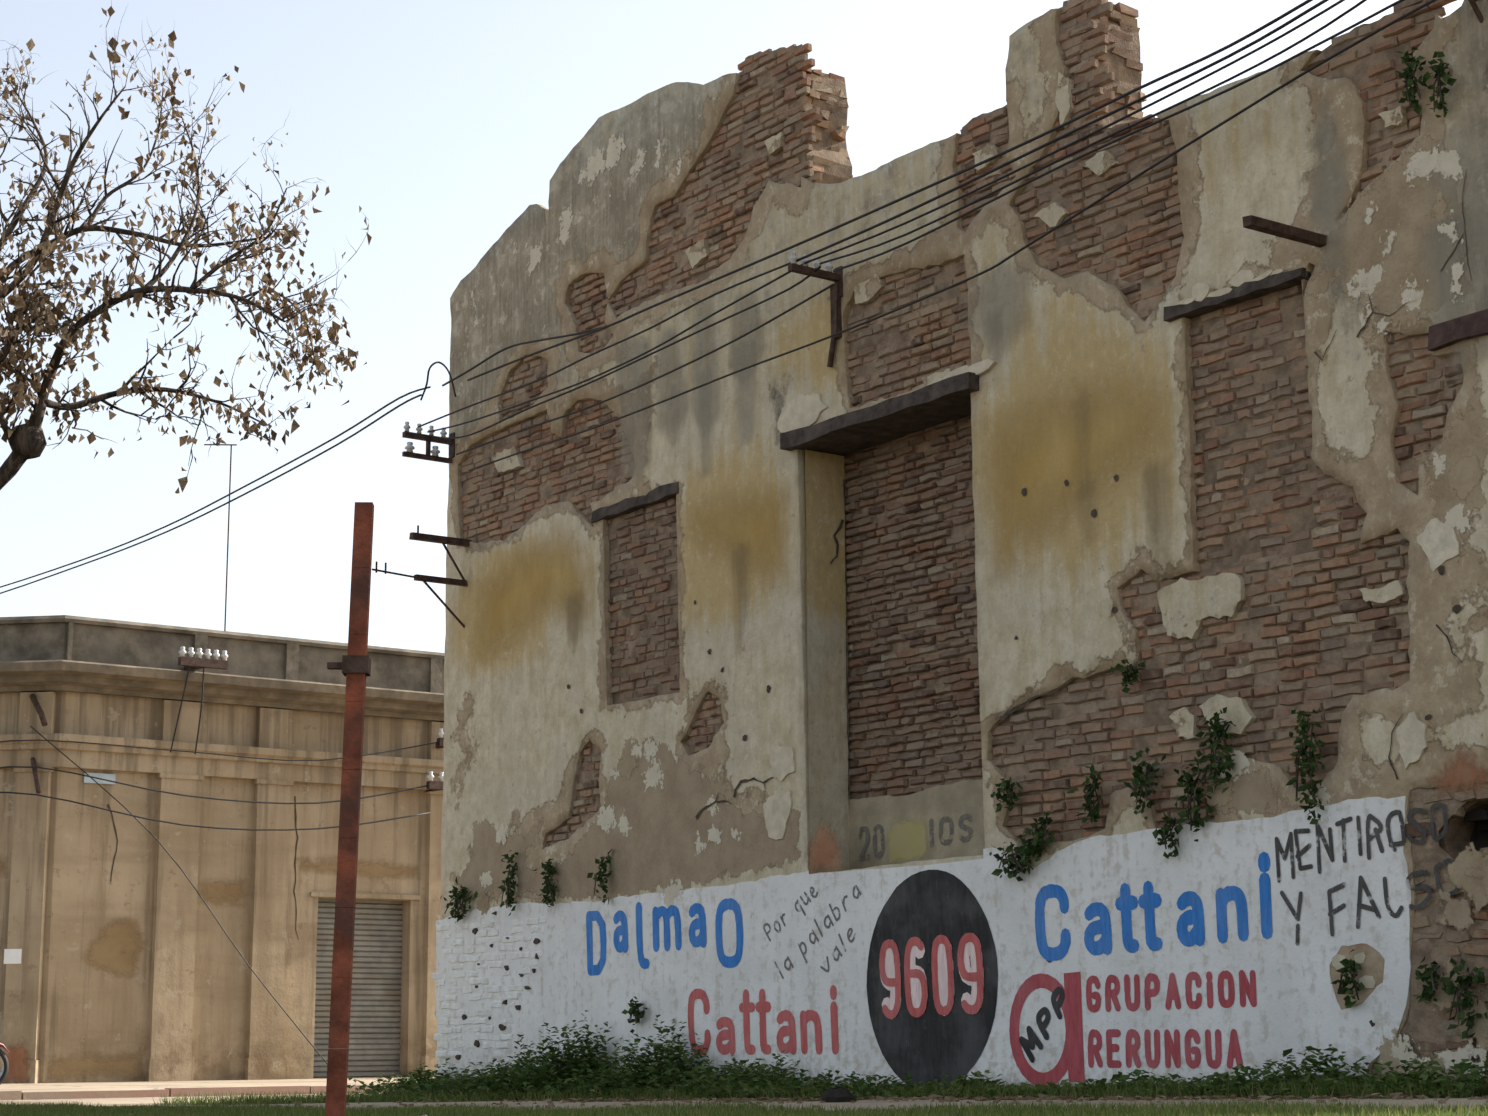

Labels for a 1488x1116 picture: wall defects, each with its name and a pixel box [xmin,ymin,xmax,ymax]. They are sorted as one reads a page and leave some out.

flaking render [512,43,853,354]
flaking render [956,0,1184,321]
flaking render [1306,0,1488,534]
flaking render [460,356,636,543]
crack [998,681,1070,724]
water stain [1001,400,1146,552]
flaking render [992,359,1410,844]
flaking render [458,693,801,1031]
peeling [1330,944,1384,1010]
spalling [1369,782,1488,1089]